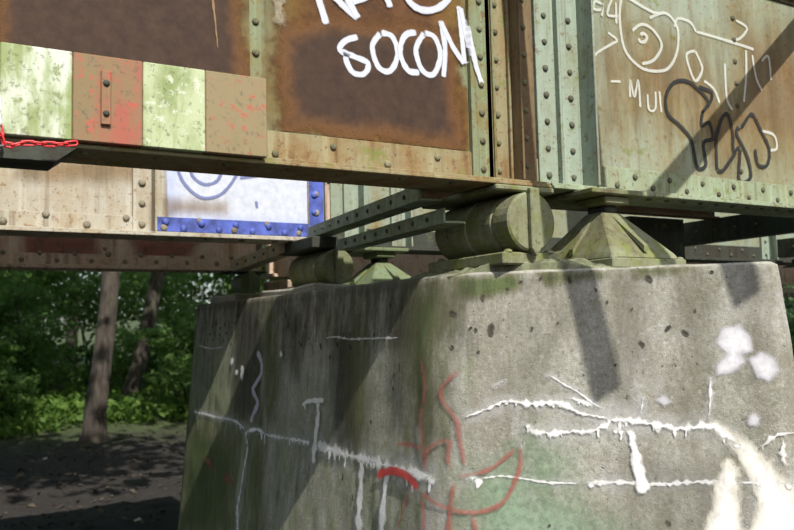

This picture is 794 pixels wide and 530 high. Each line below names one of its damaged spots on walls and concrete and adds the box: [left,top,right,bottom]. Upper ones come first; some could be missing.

rust [0,0,250,76]
rust [270,0,470,151]
damp [325,302,370,467]
damp [717,325,779,381]
damp [302,397,324,463]
damp [355,461,375,530]
damp [378,468,390,530]
damp [704,420,794,530]